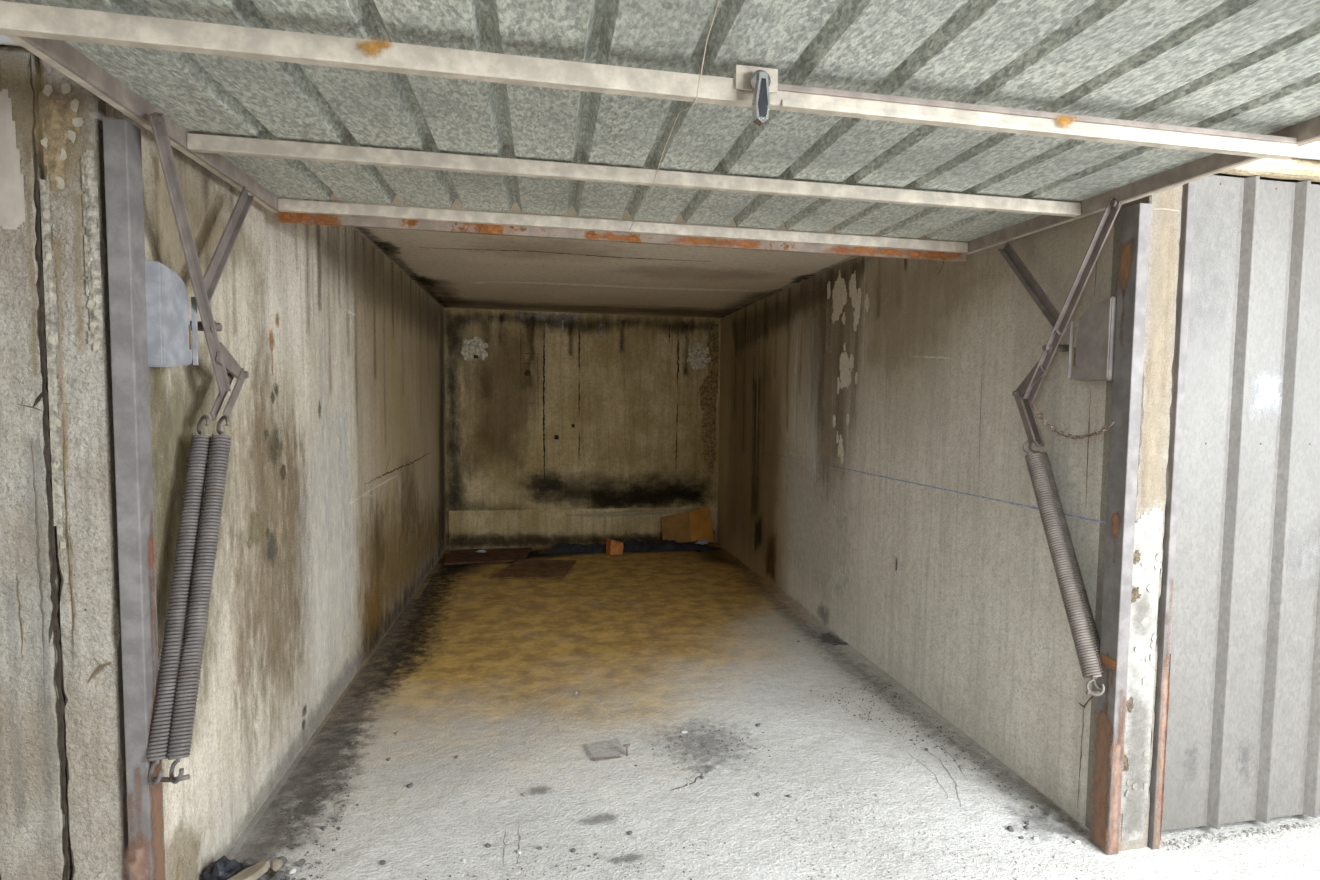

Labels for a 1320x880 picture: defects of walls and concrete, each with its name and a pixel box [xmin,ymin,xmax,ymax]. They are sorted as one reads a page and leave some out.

rust [359,40,390,55]
rust [1057,116,1077,127]
rust [281,213,338,223]
rust [586,233,637,241]
rust [674,236,760,248]
rust [831,246,961,260]
peeling [827,270,869,394]
crack [0,54,115,880]
water stain [233,227,864,844]
rust [1092,654,1126,853]
rust [1154,654,1171,847]
rust [127,760,165,880]